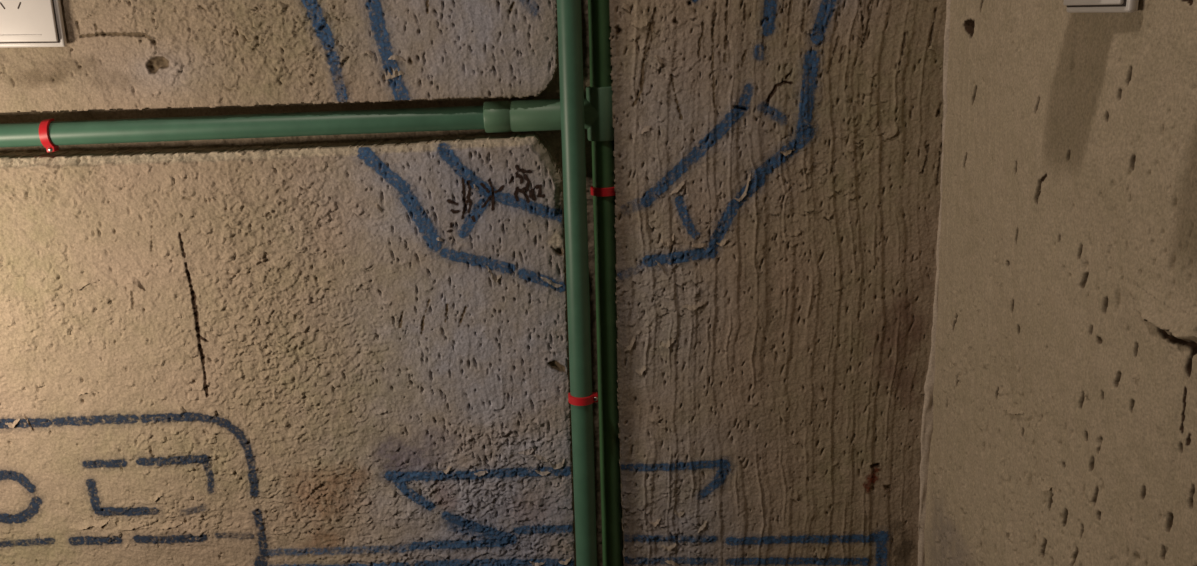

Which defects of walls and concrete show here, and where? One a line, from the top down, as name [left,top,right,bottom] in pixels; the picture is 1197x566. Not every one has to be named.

hole [1158,329,1197,377]